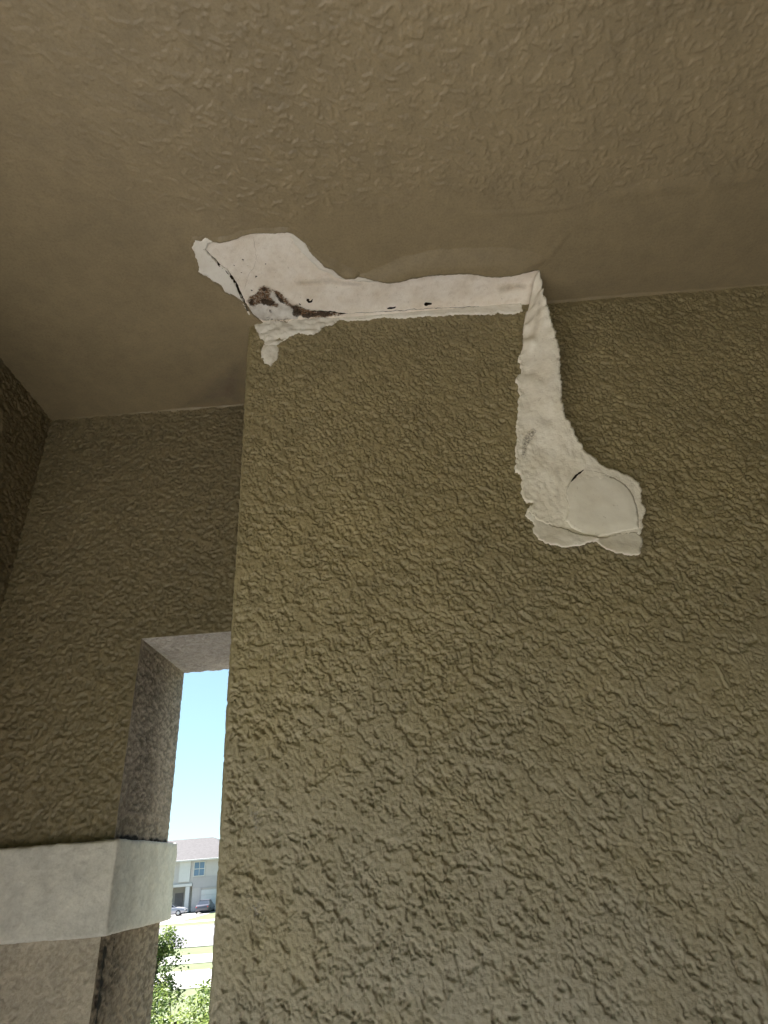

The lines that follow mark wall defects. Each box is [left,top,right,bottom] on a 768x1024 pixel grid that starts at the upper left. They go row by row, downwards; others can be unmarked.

peeling [189,227,646,556]